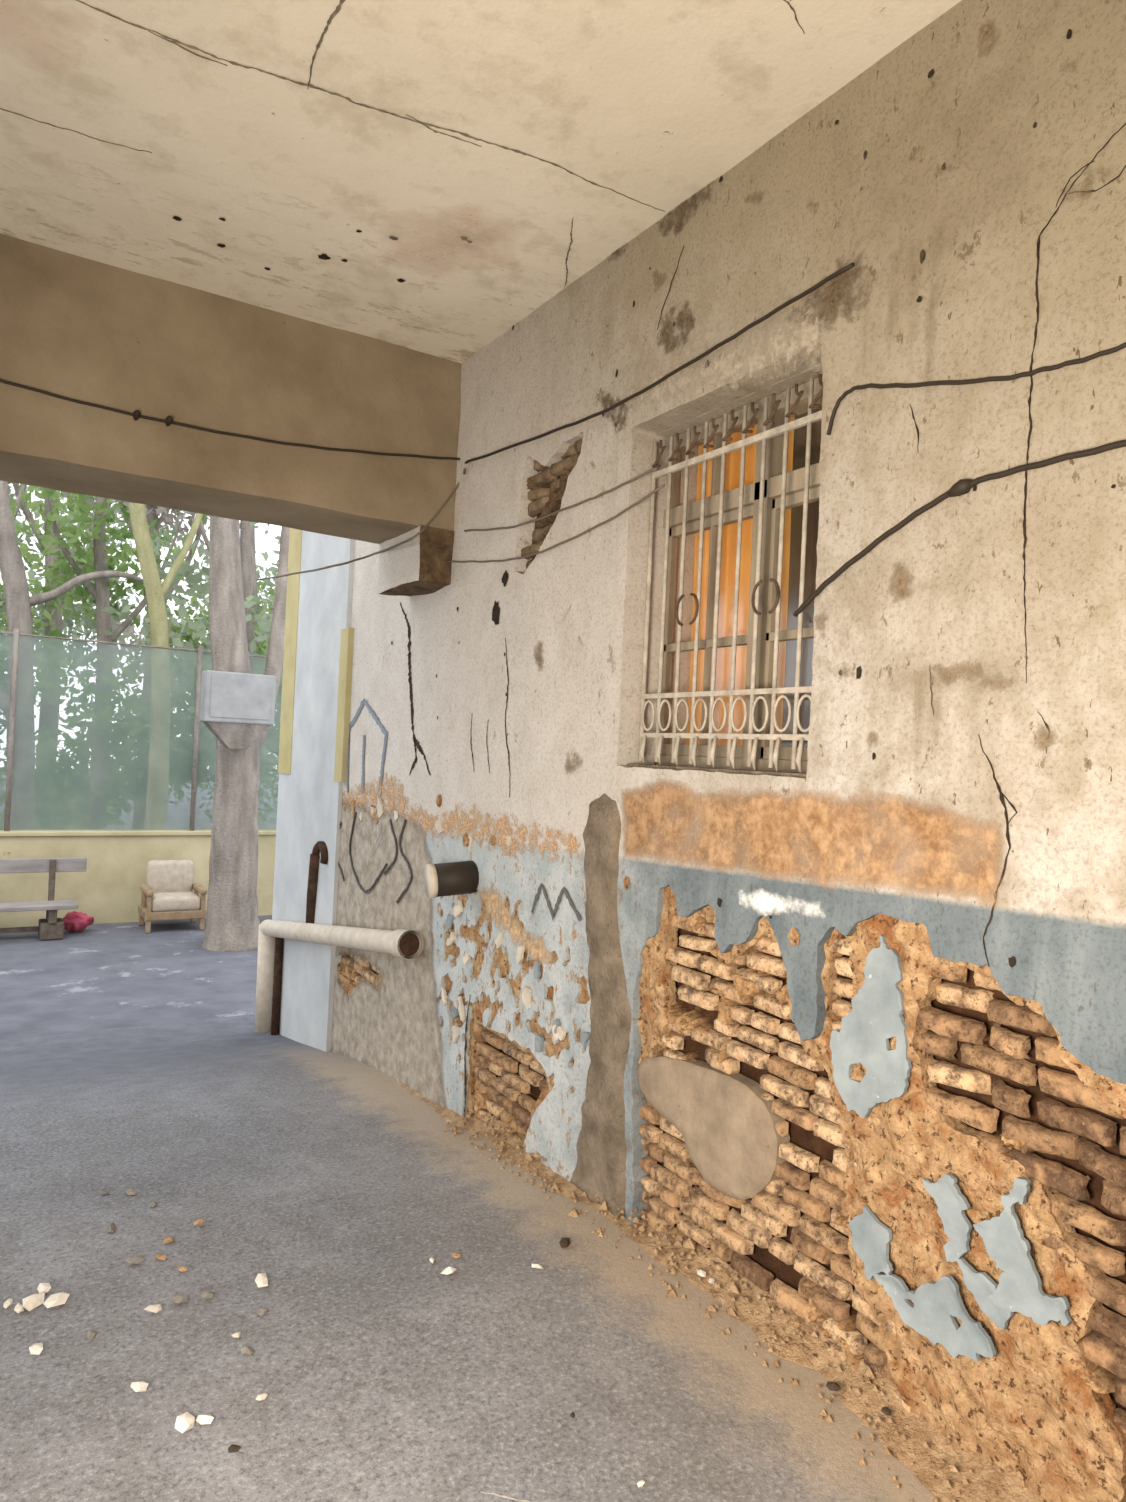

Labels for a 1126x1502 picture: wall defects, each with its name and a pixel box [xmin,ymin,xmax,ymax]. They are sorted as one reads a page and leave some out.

crack [0,108,152,153]
crack [76,0,665,212]
crack [909,404,919,449]
flaking render [521,438,583,570]
peeling [342,775,582,861]
crack [978,734,1017,967]
spalling [337,951,382,999]
spalling [438,891,591,1139]
spalling [638,887,1126,1502]